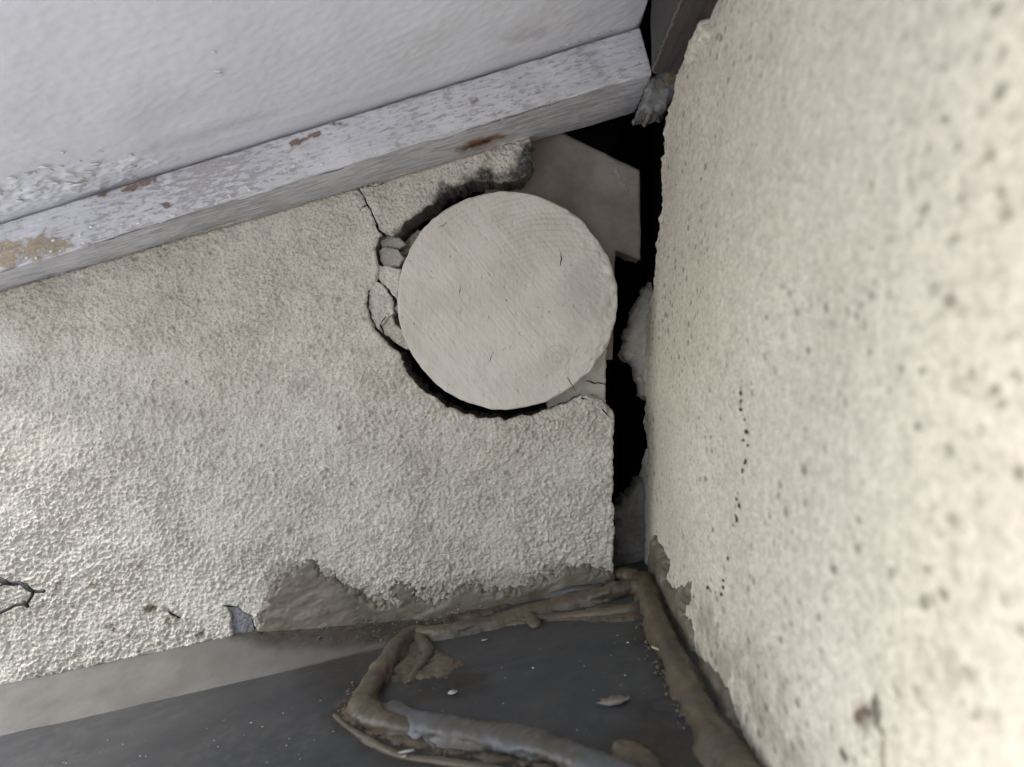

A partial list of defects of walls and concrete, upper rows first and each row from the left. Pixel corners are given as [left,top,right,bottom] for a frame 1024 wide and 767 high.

corrosion [460,135,505,151]
crack [359,182,386,237]
crack [367,291,393,345]
spalling [228,605,257,634]